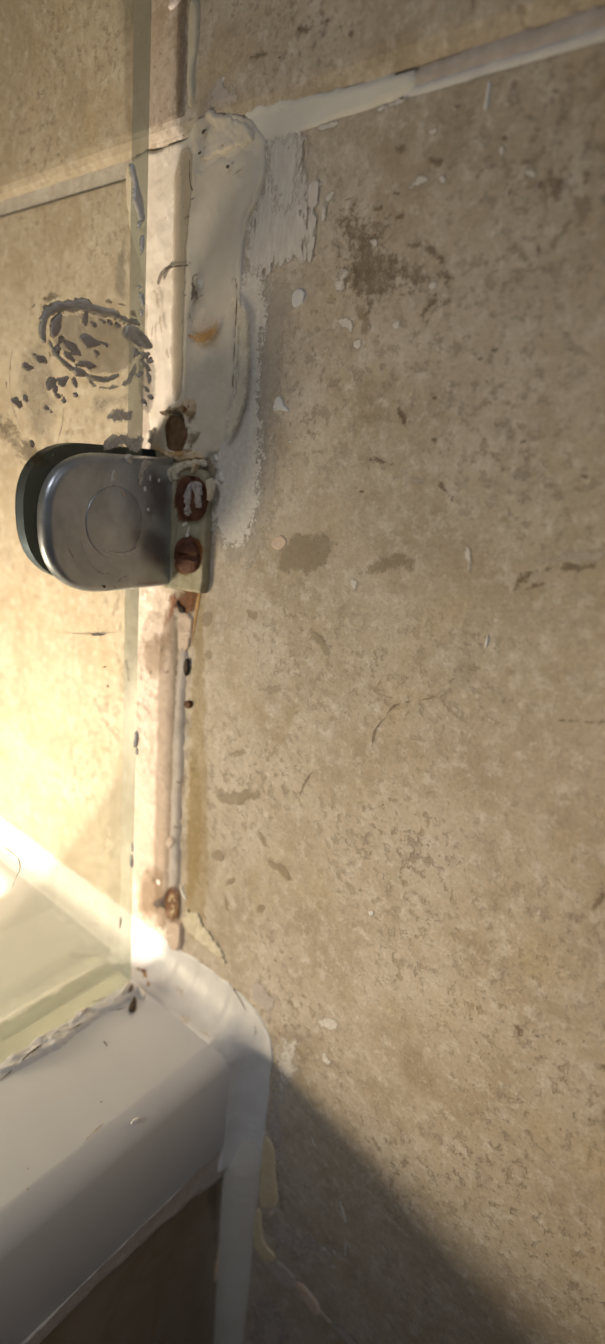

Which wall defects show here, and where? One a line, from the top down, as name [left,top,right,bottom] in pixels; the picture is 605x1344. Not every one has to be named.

rust [174,476,207,562]
rust [173,591,201,637]
rust [153,887,180,921]